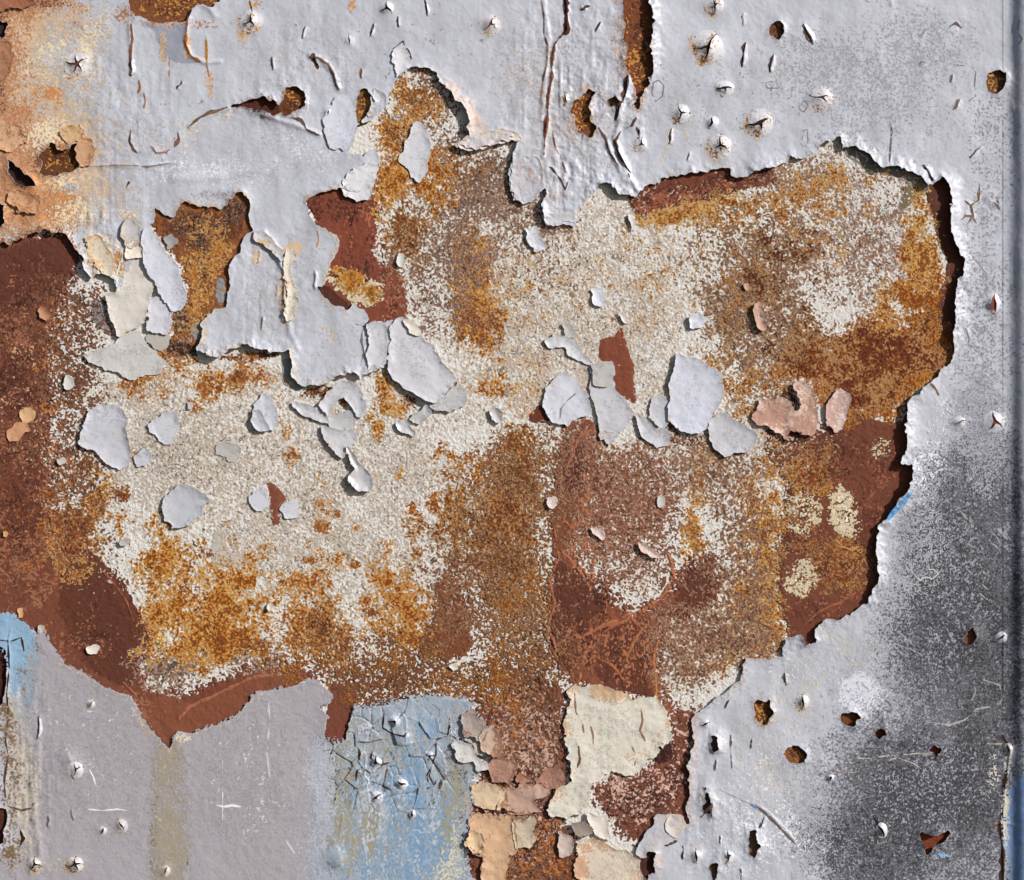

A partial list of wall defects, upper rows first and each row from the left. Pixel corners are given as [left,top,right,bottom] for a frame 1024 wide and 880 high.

corrosion [229,85,310,121]
crack [538,0,571,190]
corrosion [602,0,658,115]
peeling [60,125,129,183]
peeling [253,231,299,321]
corrosion [275,271,298,335]
peeling [6,407,36,442]
corrosion [328,398,352,416]
peeling [140,616,266,699]
peeling [0,682,73,879]
crack [329,700,493,827]
corrosion [460,776,580,880]